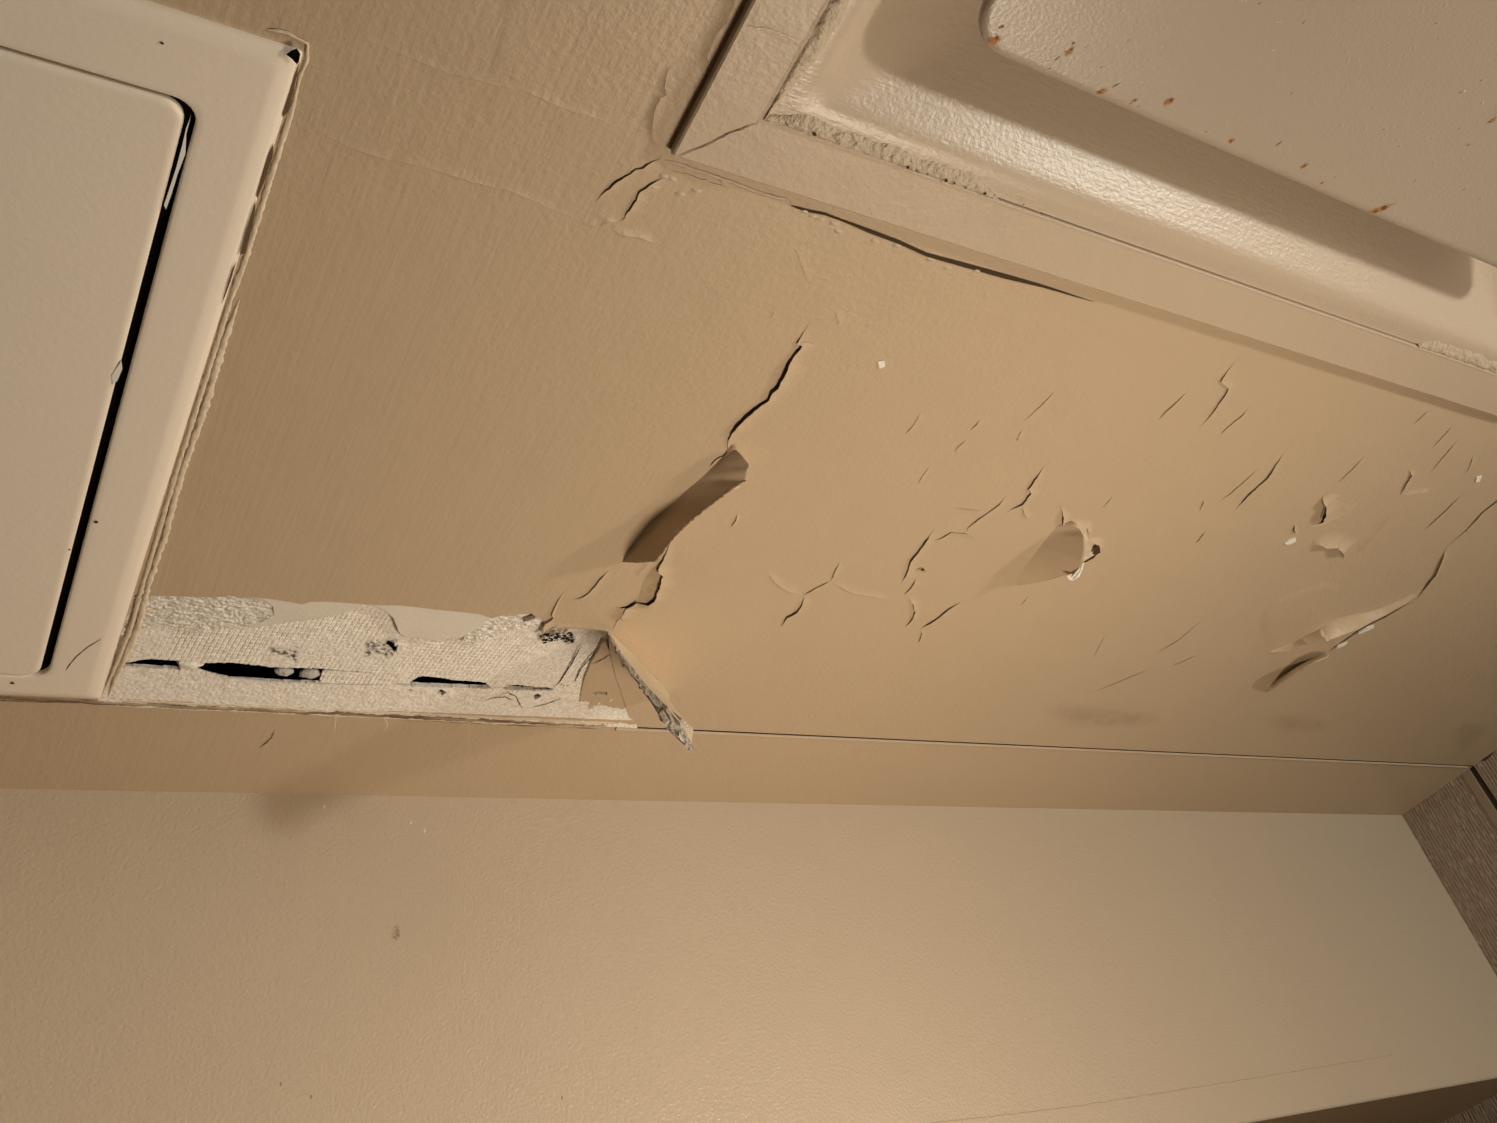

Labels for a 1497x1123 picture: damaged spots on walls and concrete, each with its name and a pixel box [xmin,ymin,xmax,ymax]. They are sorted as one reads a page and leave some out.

peeling [621,450,750,563]
peeling [1017,504,1106,586]
flaking render [97,592,637,728]